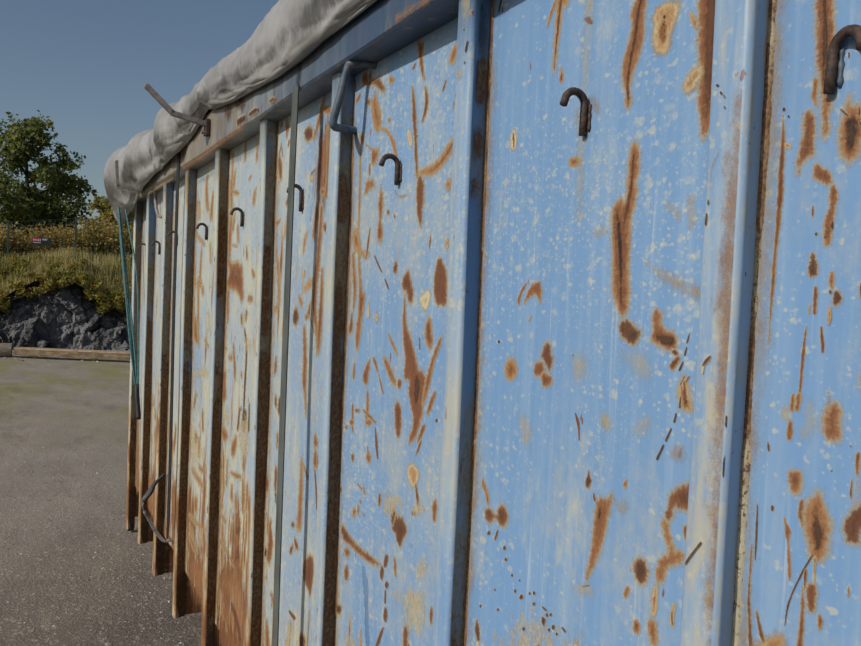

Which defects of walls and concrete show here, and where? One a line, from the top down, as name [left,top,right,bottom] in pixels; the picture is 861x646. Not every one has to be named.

rust [621,0,715,139]
rust [755,0,861,354]
rust [136,309,280,646]
rust [185,95,449,646]
rust [517,281,542,306]
rust [585,470,621,581]
rust [610,140,693,412]
rust [623,482,689,646]
rust [701,134,740,443]
rust [739,452,861,646]
rust [821,401,843,443]